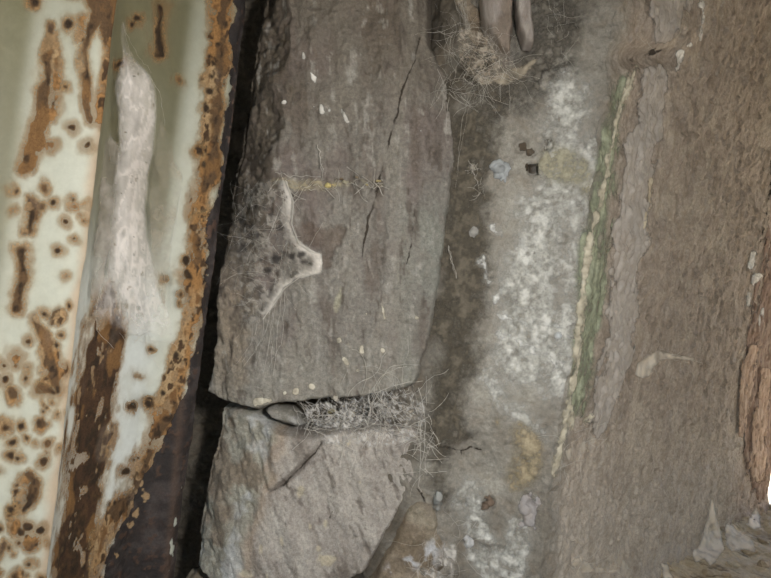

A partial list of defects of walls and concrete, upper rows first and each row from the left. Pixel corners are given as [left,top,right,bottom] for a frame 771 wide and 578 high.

crack [388,38,420,147]
crack [362,174,381,257]
rust [0,0,234,578]
crack [282,443,322,486]